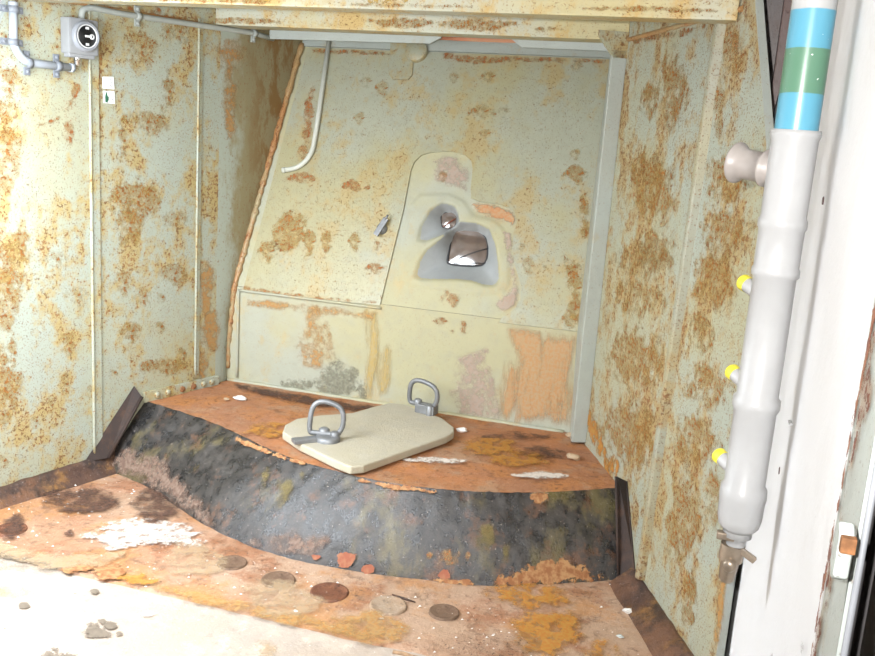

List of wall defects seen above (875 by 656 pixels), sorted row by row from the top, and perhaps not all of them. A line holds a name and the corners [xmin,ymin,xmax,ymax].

rust [109,69,186,246]
rust [607,151,675,385]
rust [0,225,29,424]
rust [237,383,374,411]
rust [235,422,309,465]
rust [587,398,653,476]
rust [42,488,119,514]
rust [112,448,210,524]
leakage [41,646,77,656]
leakage [82,619,123,638]
rust [0,513,408,644]
rust [446,557,618,656]